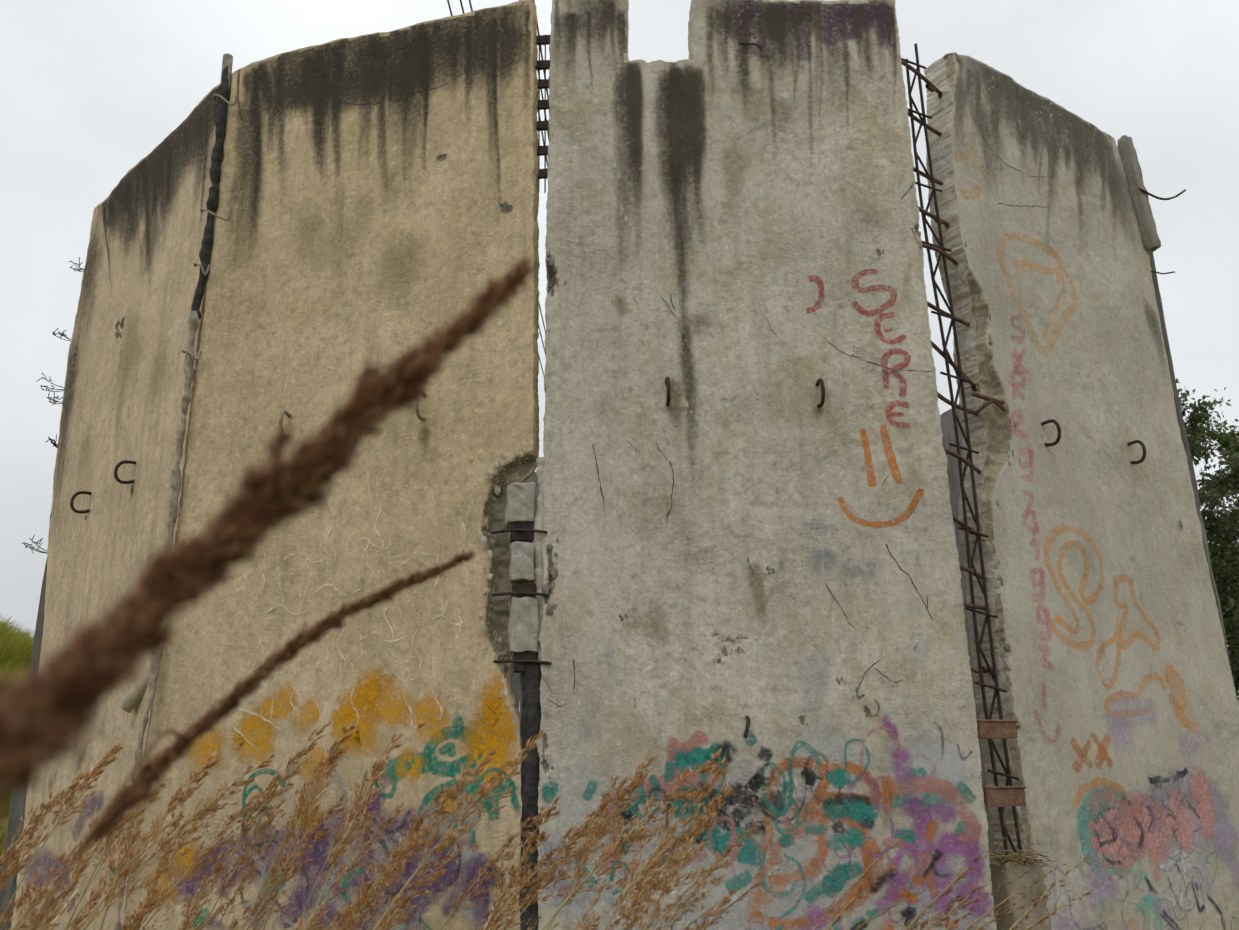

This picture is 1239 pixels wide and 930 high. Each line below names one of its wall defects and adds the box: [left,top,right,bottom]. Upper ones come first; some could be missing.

leakage [82,85,220,311]
leakage [237,5,530,214]
leakage [554,0,640,200]
leakage [660,67,703,222]
leakage [708,0,896,91]
spalling [944,52,960,90]
leakage [954,59,1128,223]
leakage [58,346,77,475]
leakage [681,330,694,420]
spalling [475,448,536,697]
spalling [541,538,559,615]
spalling [966,273,1039,858]